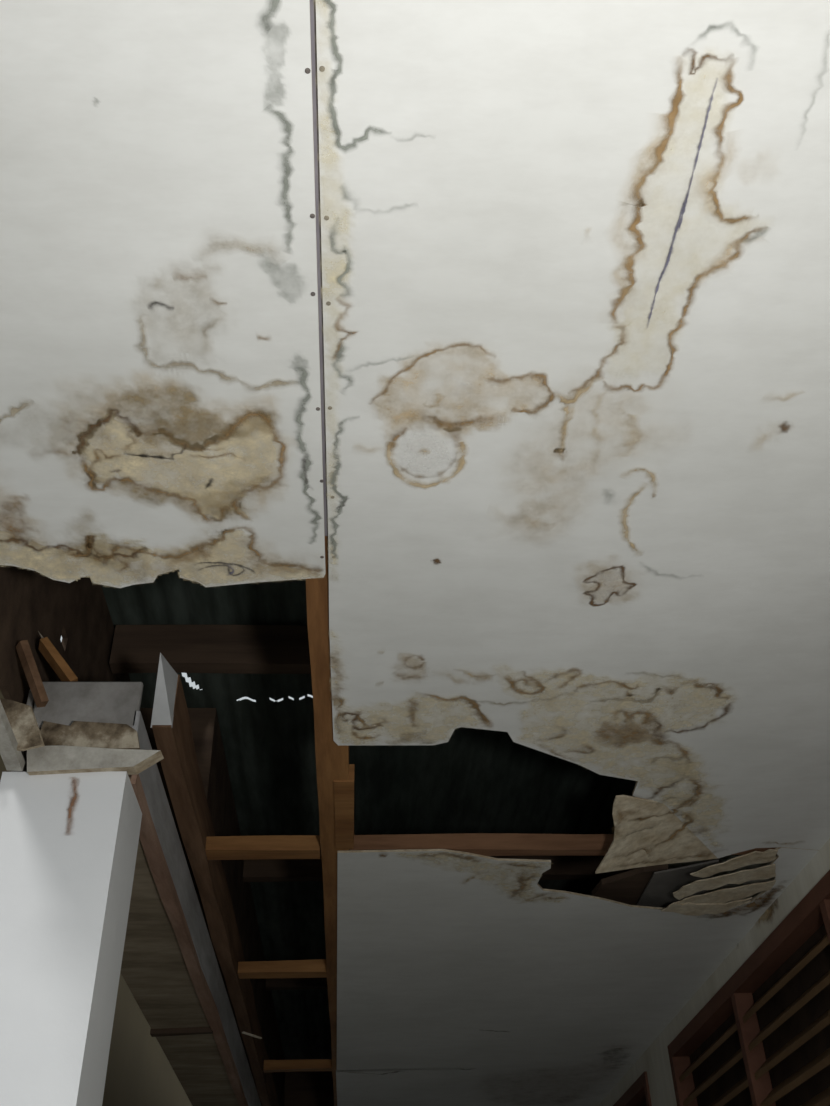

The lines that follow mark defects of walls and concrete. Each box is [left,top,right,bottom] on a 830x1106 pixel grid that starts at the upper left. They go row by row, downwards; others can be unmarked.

water stain [263,0,280,28]
water stain [325,0,383,151]
water stain [716,71,743,143]
water stain [274,111,292,222]
water stain [612,55,717,318]
water stain [612,157,761,392]
water stain [498,338,624,434]
water stain [79,388,286,521]
water stain [254,370,347,555]
water stain [0,503,309,585]
water stain [584,566,636,606]
rust [67,787,77,832]